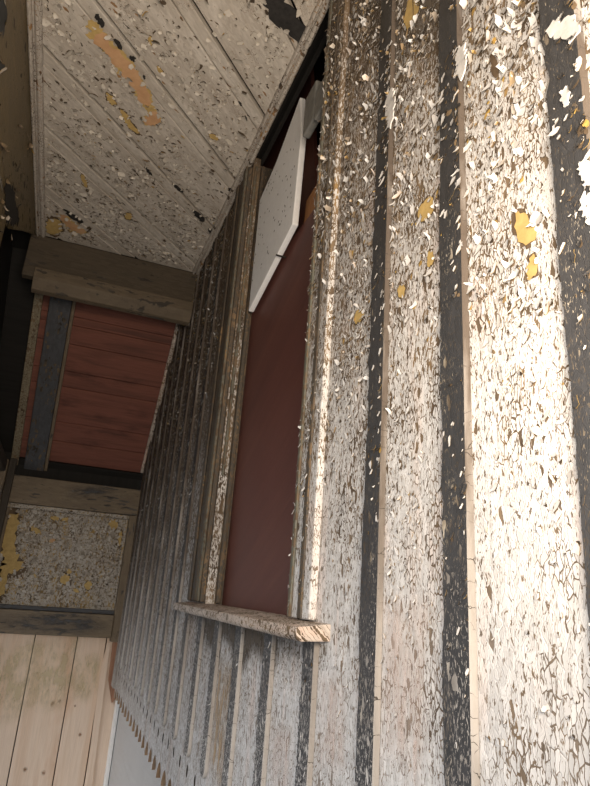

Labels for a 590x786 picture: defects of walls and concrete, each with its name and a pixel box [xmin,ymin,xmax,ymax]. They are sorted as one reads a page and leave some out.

peeling [0,175,22,240]
peeling [288,0,590,614]
peeling [0,508,36,603]